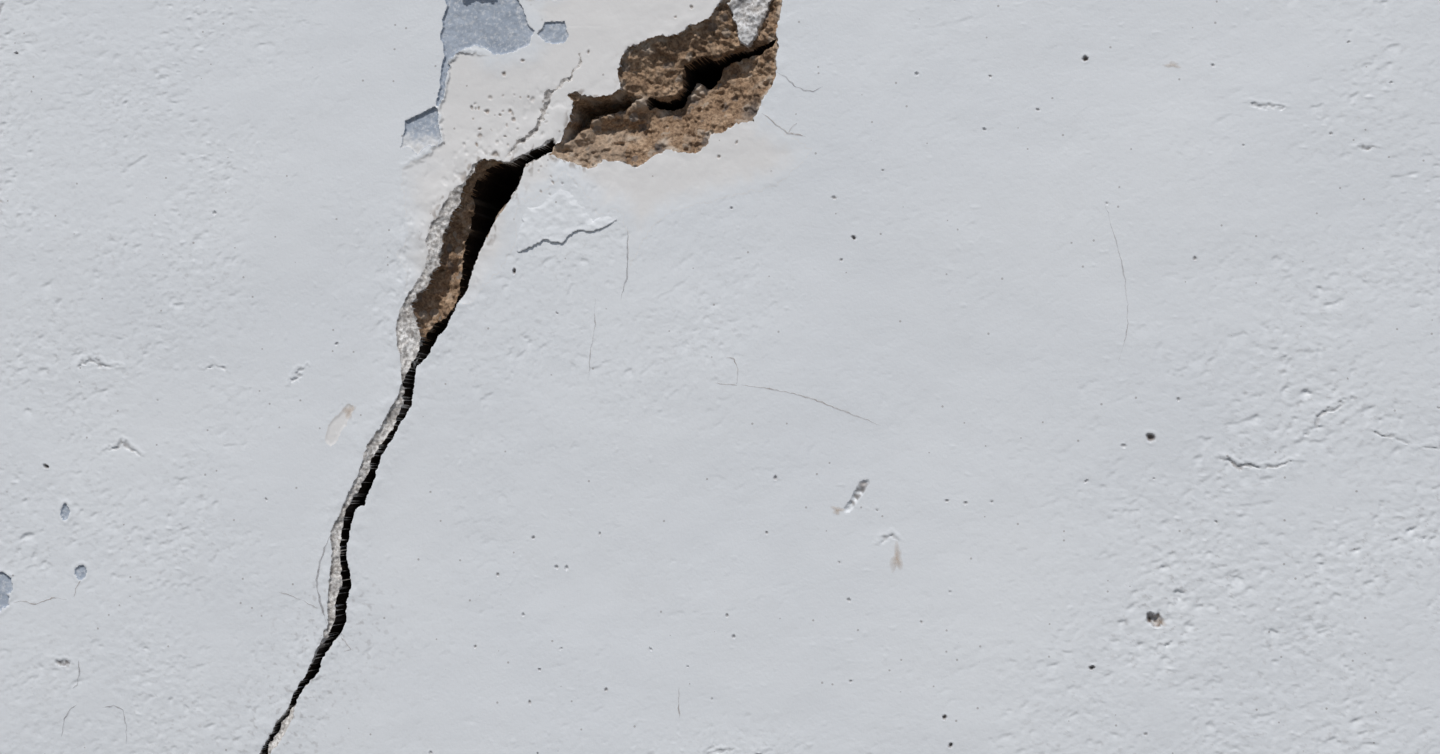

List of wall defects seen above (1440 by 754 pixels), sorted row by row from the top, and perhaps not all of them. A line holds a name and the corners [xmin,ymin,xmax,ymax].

peeling [397,0,812,305]
crack [259,53,582,754]
peeling [0,572,13,611]